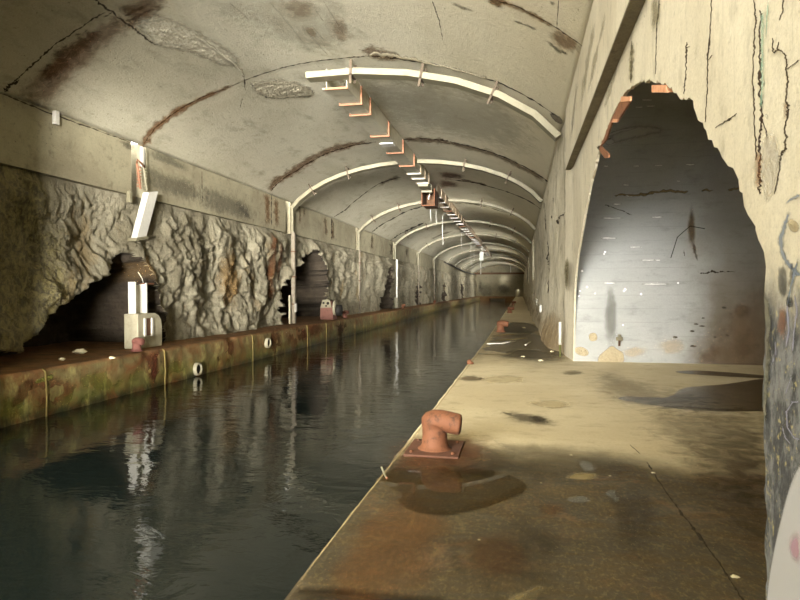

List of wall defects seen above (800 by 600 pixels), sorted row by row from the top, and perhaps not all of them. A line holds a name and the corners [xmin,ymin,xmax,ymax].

corrosion [143,86,228,145]
crack [0,0,438,145]
crack [485,78,561,119]
crack [683,0,798,194]
corrosion [265,141,365,222]
corrosion [145,350,159,380]
corrosion [271,332,281,352]
peeling [575,333,597,356]
peeling [598,346,624,362]
crack [630,445,744,600]